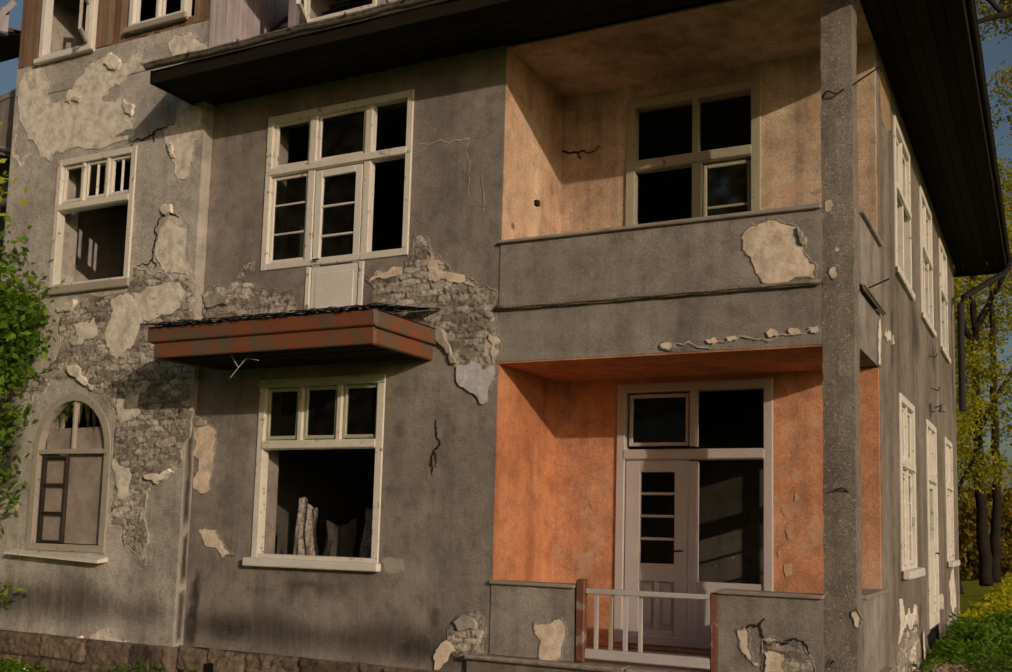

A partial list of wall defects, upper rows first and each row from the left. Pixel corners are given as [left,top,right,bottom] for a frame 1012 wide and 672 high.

peeling [11,51,143,167]
peeling [162,99,204,180]
crack [562,146,600,159]
crack [138,213,179,268]
peeling [740,218,844,284]
flaking render [364,232,504,406]
flaking render [27,204,298,567]
crack [430,420,441,475]
flaking render [433,610,487,670]
peeling [532,616,569,661]
flaking render [735,625,848,672]
flaking render [893,567,961,672]